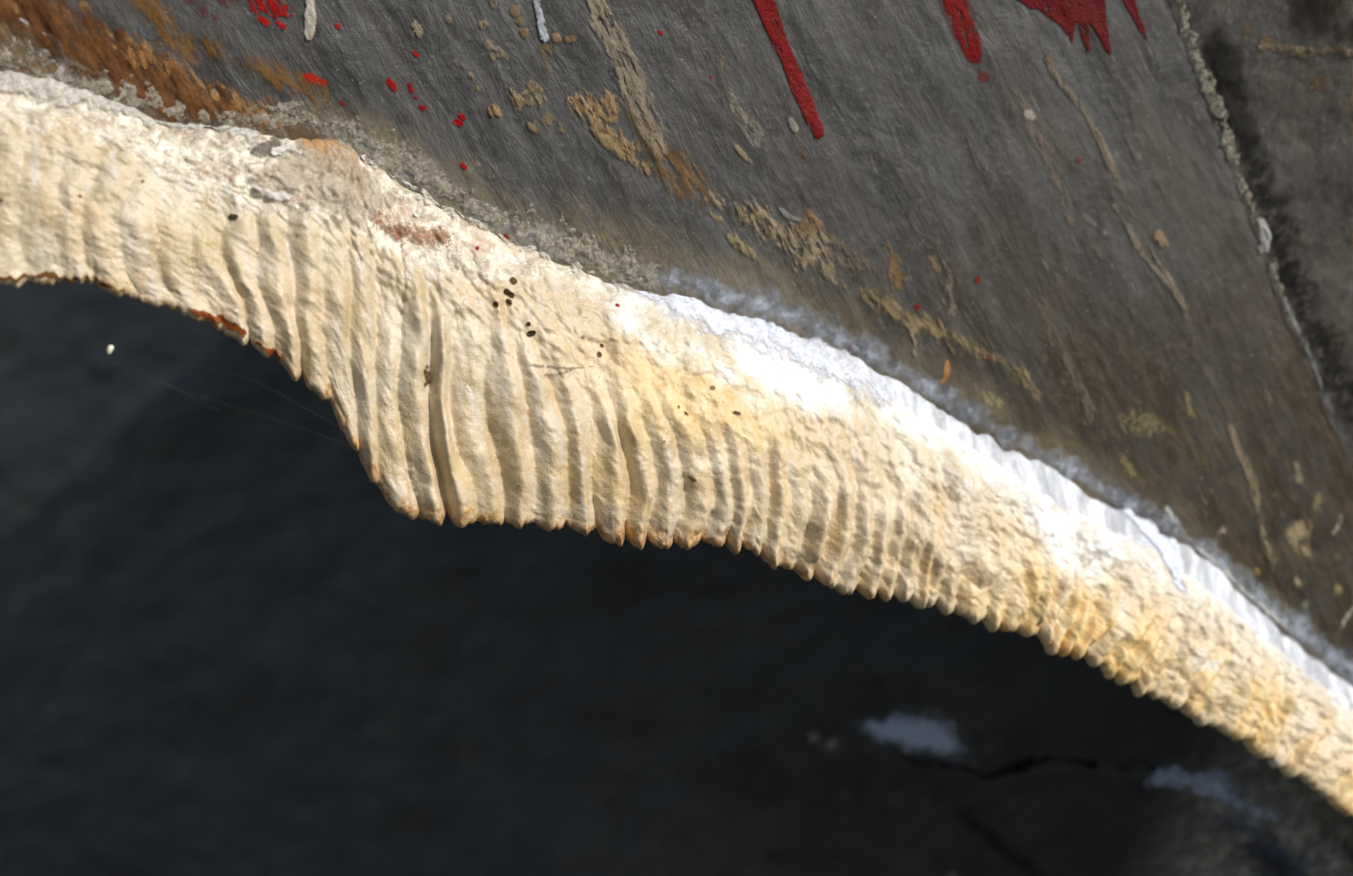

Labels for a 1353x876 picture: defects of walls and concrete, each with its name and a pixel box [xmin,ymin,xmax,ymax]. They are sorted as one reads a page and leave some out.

leakage [113,79,186,120]
corrosion [0,0,334,141]
leakage [213,101,321,133]
leakage [510,0,576,69]
leakage [587,0,714,203]
leakage [534,216,661,290]
leakage [634,289,895,406]
leakage [860,243,1041,401]
crack [1046,55,1275,568]
leakage [1204,29,1353,422]
leakage [1116,495,1187,591]
leakage [864,713,991,771]